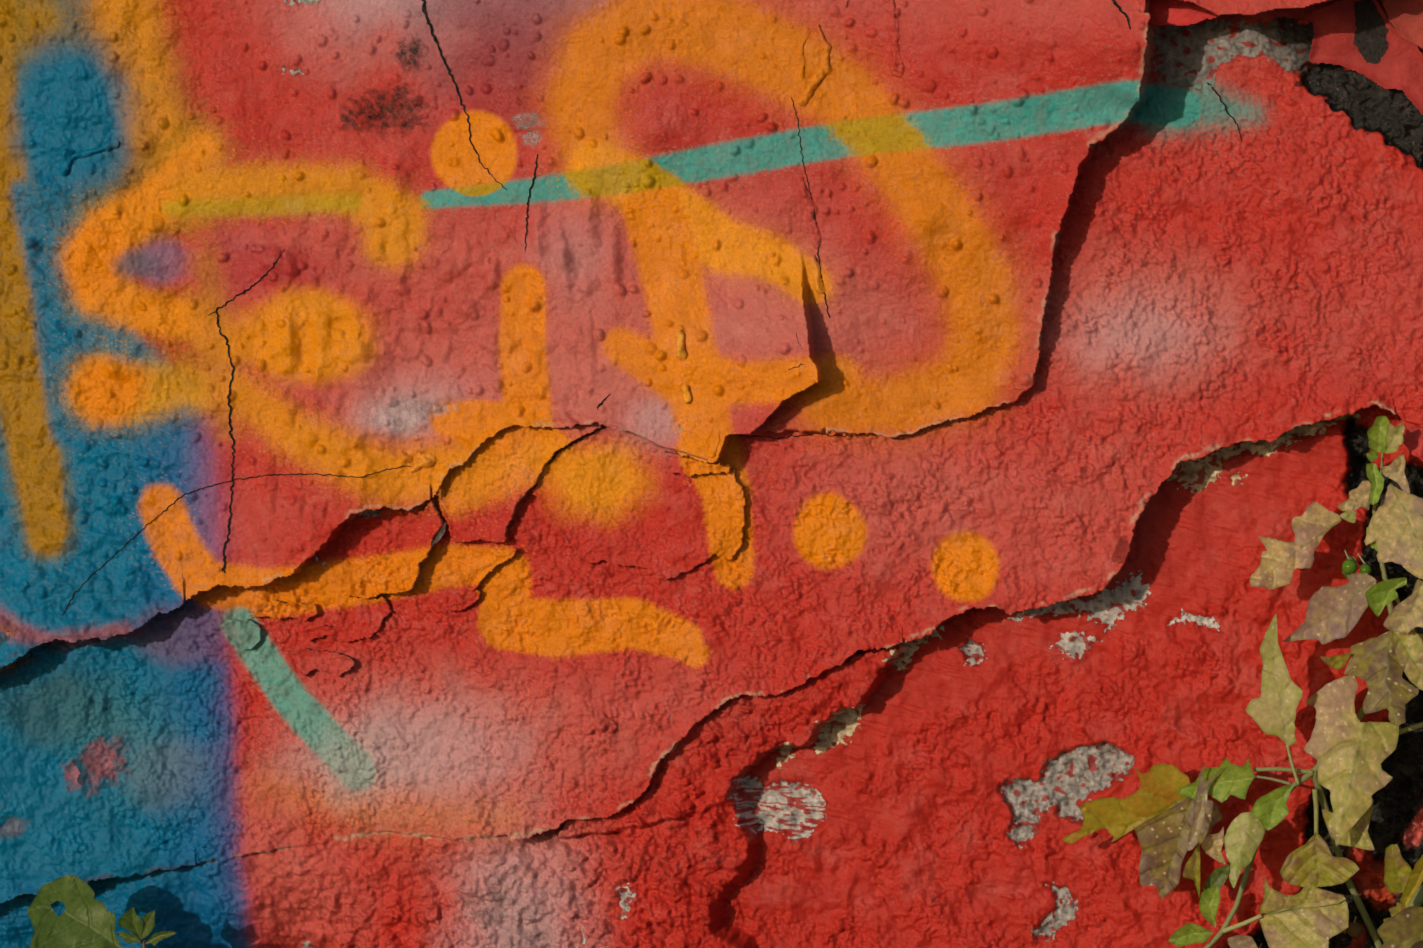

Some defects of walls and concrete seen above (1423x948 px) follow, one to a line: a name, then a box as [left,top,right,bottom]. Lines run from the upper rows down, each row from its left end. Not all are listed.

crack [422,0,538,250]
crack [1112,0,1131,30]
peeling [826,0,1423,438]
crack [62,249,411,616]
peeling [0,282,818,677]
peeling [508,385,1423,858]
spalling [615,882,638,920]
spalling [1031,882,1079,942]
peeling [1250,930,1269,948]
peeling [1302,882,1403,948]
peeling [1368,671,1423,907]